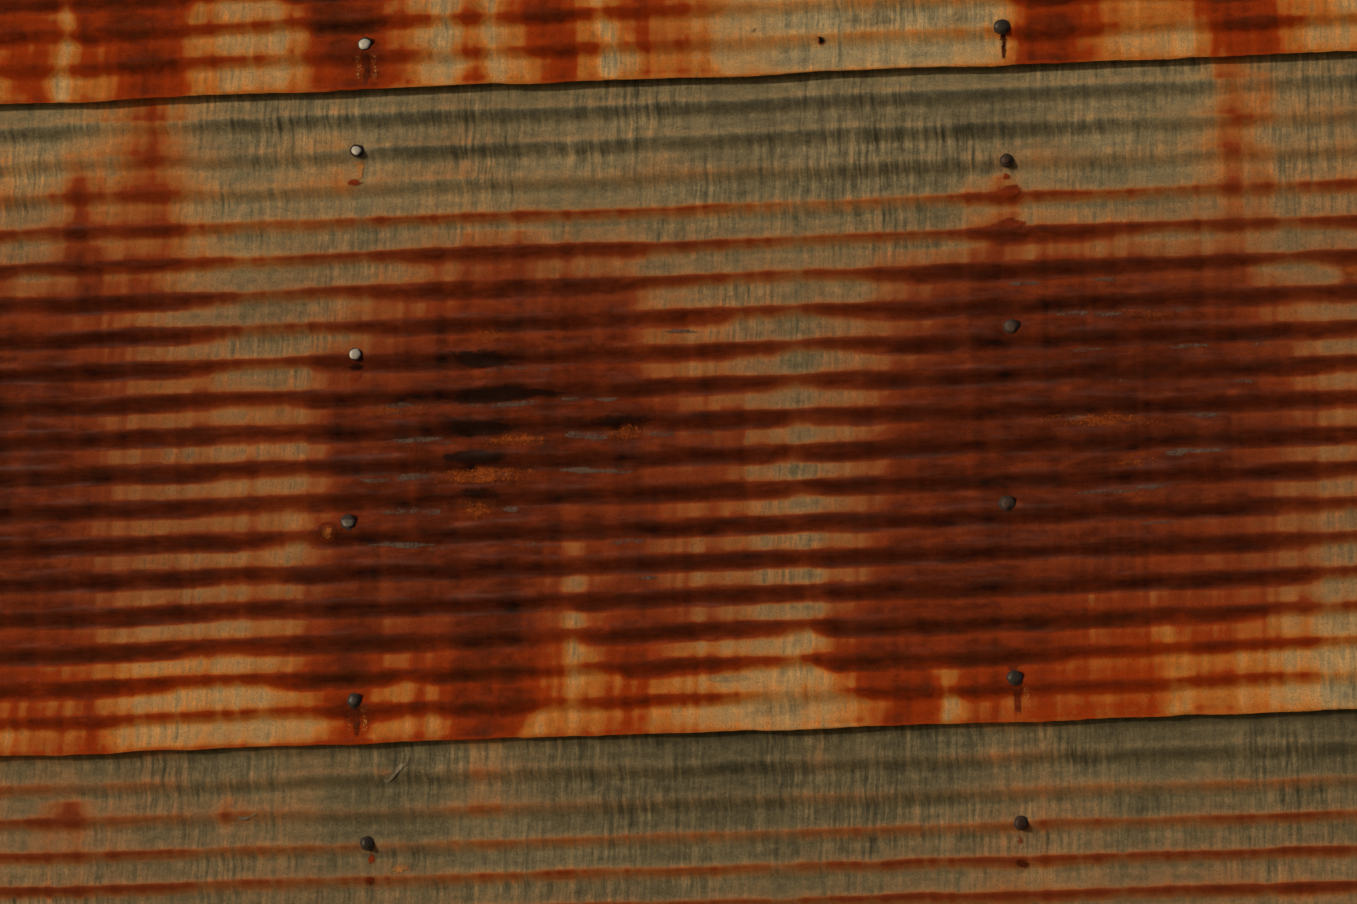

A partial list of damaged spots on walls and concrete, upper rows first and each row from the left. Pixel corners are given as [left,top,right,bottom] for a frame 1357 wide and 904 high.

rust [997,217,1026,229]
rust [0,784,324,865]
rust [784,809,1357,836]
rust [0,844,1357,899]
rust [541,879,1357,904]